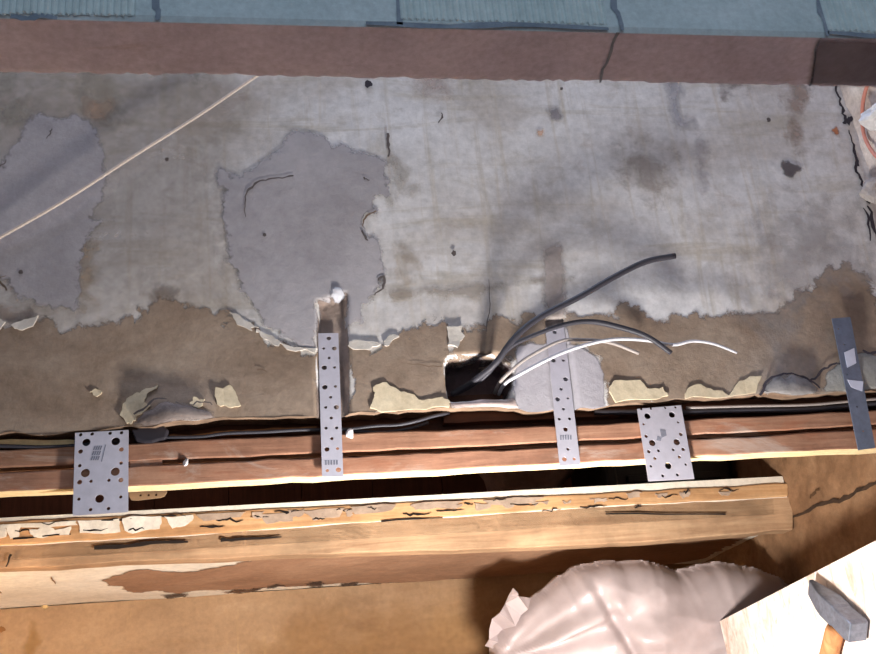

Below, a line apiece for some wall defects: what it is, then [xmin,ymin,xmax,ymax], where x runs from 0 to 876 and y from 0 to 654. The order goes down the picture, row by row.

damp [790,41,876,137]
spalling [781,161,802,177]
crack [835,85,876,241]
flaking render [0,113,390,435]
flaking render [348,261,876,413]
peeling [0,504,396,539]
crack [793,481,876,518]